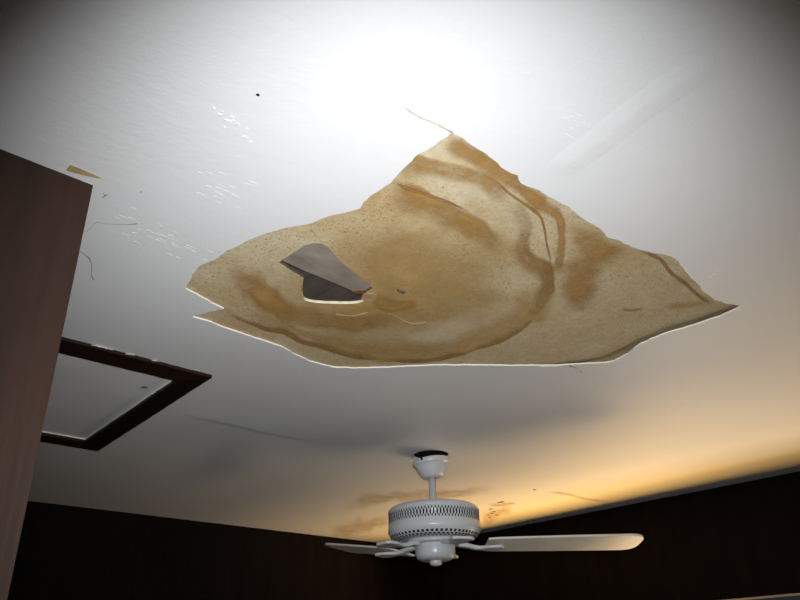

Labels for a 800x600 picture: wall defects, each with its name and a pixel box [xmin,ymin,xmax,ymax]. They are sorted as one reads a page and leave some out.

crack [404,107,453,134]
peeling [66,165,101,178]
leakage [244,142,565,363]
peeling [186,133,738,368]
leakage [649,253,706,308]